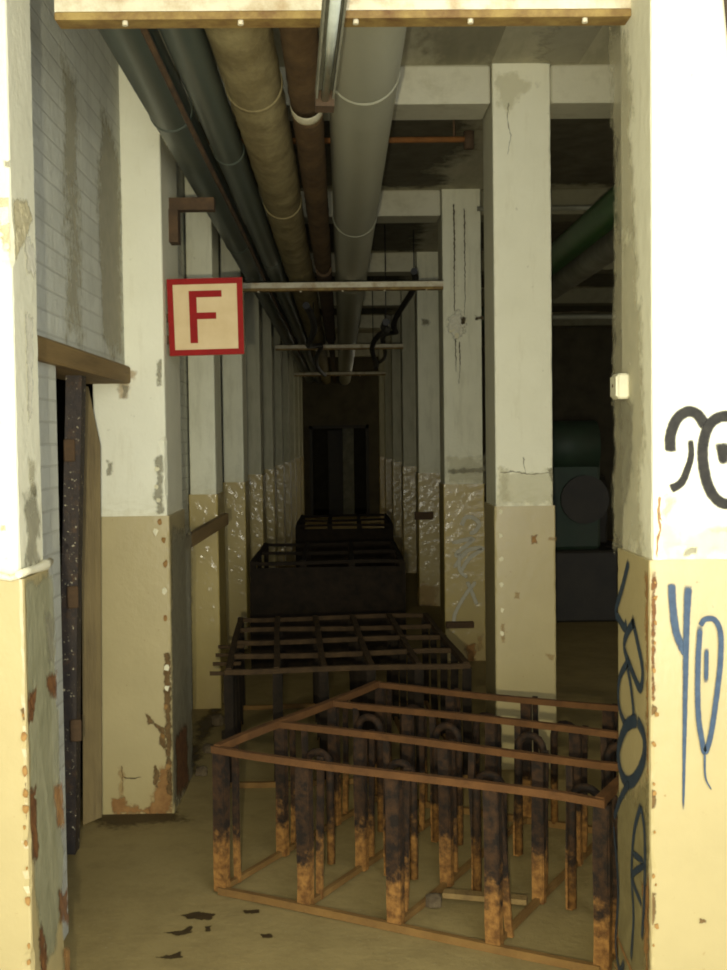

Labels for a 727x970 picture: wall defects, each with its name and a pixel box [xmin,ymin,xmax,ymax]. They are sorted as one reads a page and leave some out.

spalling [146,653,173,795]